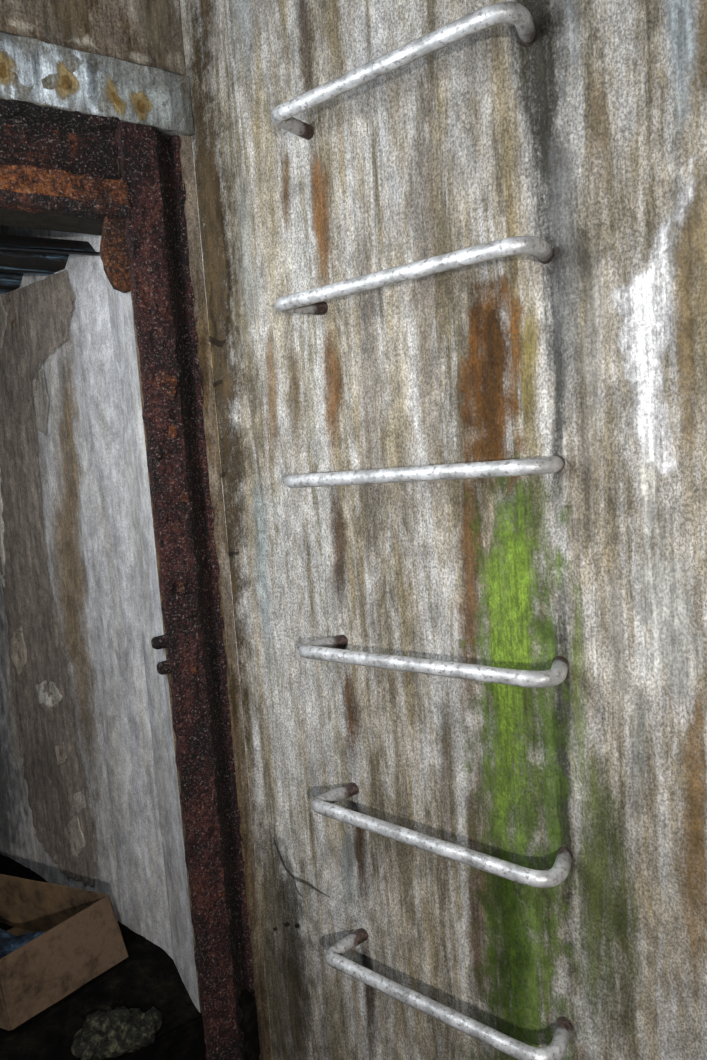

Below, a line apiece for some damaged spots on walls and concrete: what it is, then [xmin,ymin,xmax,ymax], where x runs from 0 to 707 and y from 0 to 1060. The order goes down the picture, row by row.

corrosion [55,62,79,100]
corrosion [106,77,152,120]
leakage [511,0,579,456]
corrosion [149,425,177,459]
corrosion [460,276,535,462]
leakage [612,179,703,690]
corrosion [55,342,93,751]
corrosion [460,476,516,664]
corrosion [467,779,483,853]
leakage [473,477,634,1047]
corrosion [469,867,486,991]